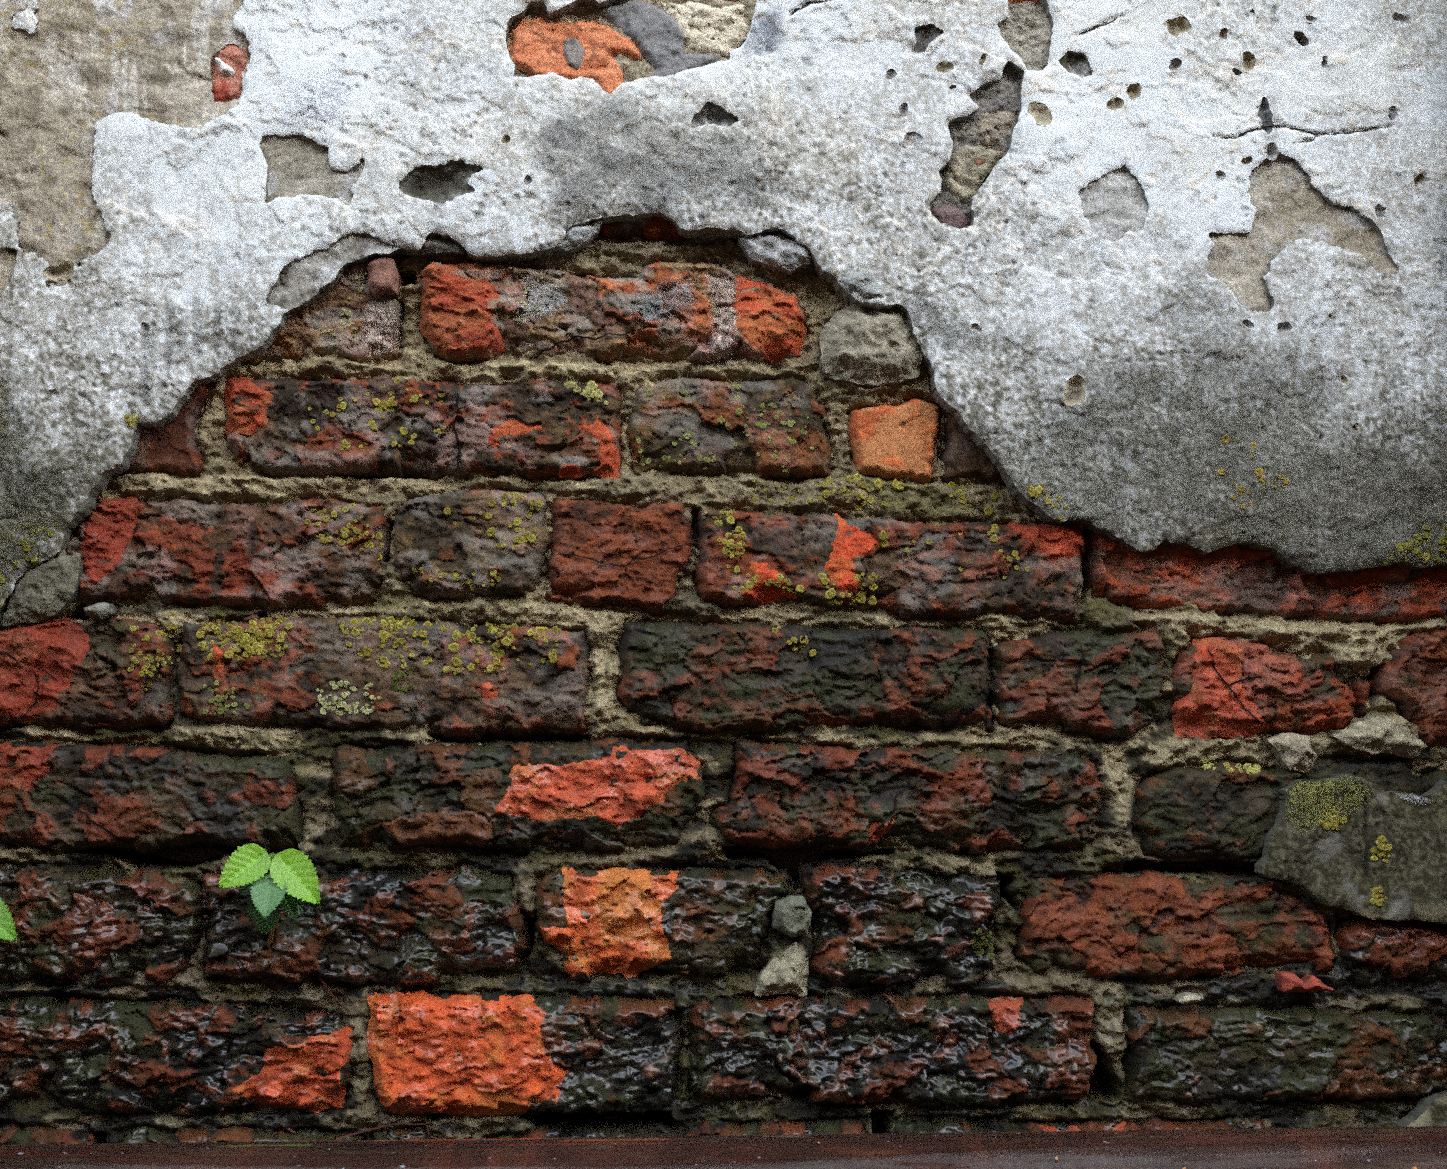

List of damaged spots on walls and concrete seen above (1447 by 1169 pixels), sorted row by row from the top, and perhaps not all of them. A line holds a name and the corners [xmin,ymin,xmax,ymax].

spalling [506,0,756,94]
flaking render [914,25,943,52]
flaking render [0,0,251,298]
flaking render [260,135,365,206]
flaking render [399,162,483,203]
spalling [930,0,1091,229]
crack [1214,125,1392,142]
water stain [0,403,66,585]
spalling [0,216,1447,1145]